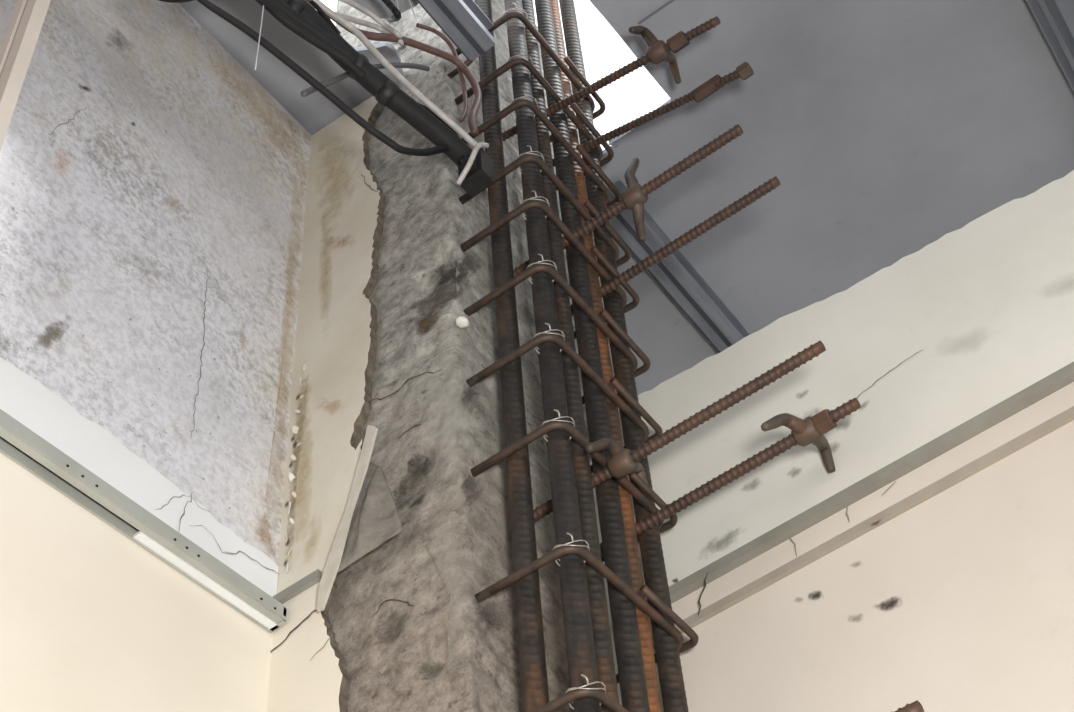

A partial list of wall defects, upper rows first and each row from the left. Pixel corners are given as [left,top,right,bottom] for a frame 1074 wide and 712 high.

crack [191,269,209,437]
spalling [412,0,549,712]
spalling [504,0,689,712]
crack [857,350,922,398]
crack [160,493,277,573]